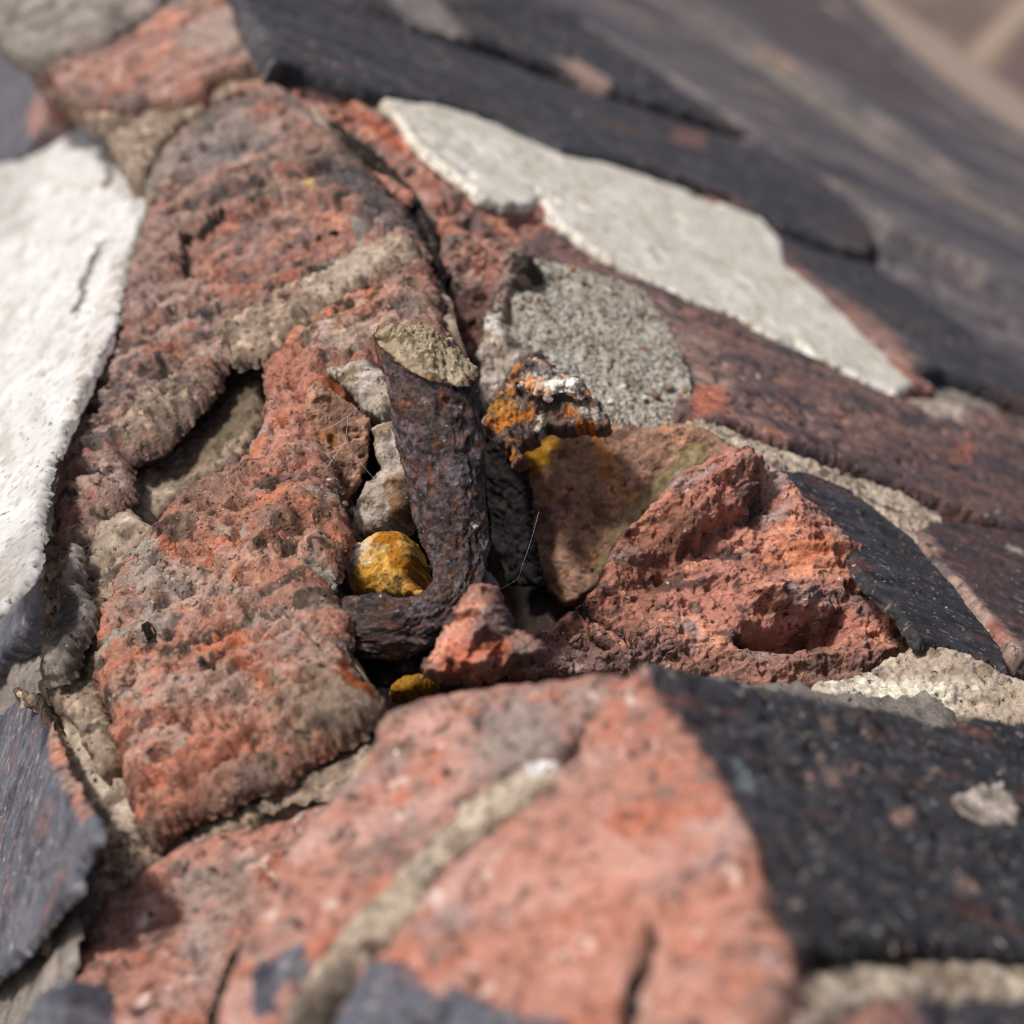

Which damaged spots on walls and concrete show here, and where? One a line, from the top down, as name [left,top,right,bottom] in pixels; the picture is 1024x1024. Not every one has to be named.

rust [480,355,613,587]